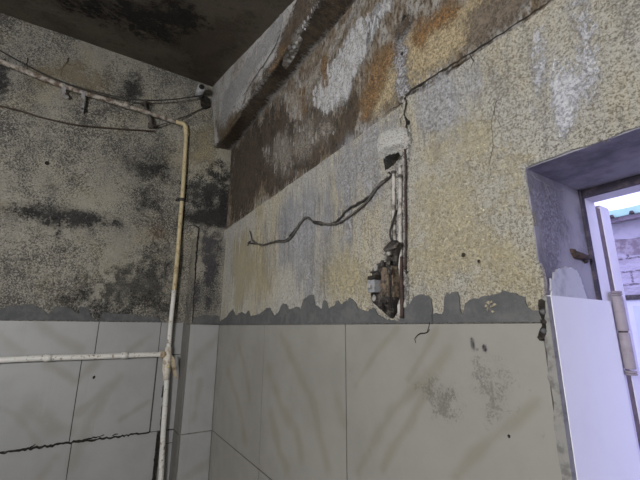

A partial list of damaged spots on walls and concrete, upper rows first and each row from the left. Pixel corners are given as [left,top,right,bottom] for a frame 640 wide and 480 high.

crack [383,0,551,146]
water stain [2,202,123,239]
water stain [122,155,169,212]
water stain [175,0,383,312]
spalling [383,110,412,308]
spalling [537,299,547,341]